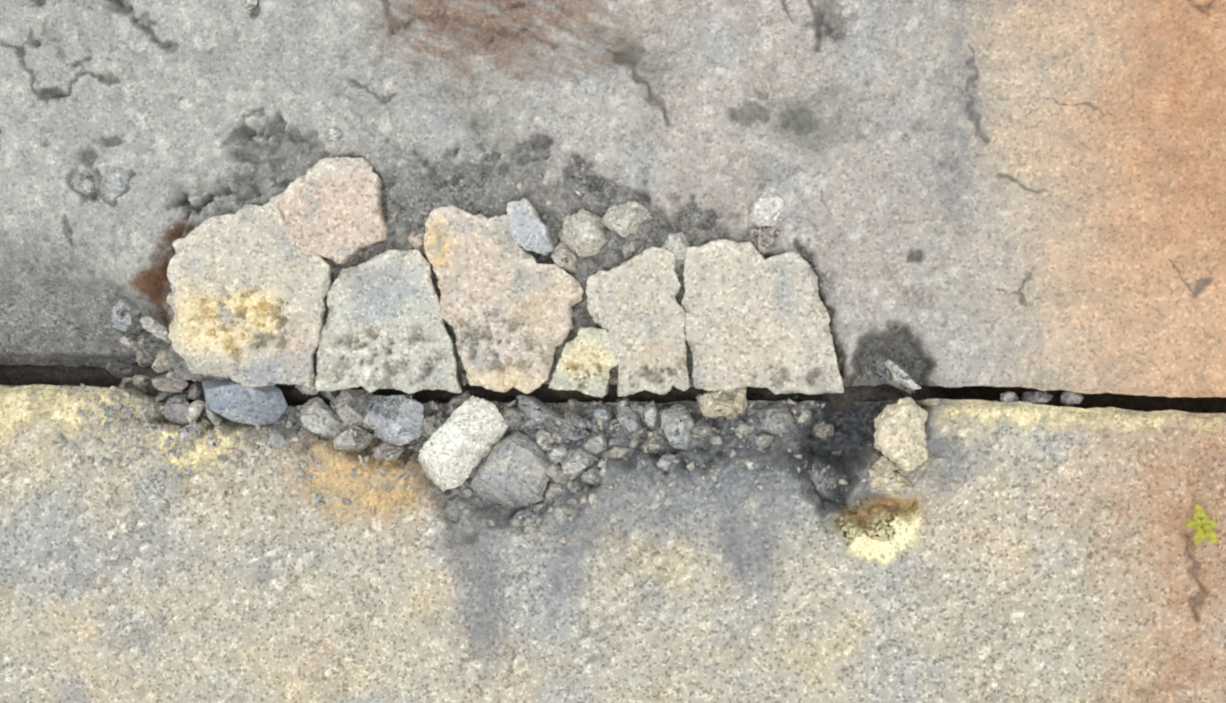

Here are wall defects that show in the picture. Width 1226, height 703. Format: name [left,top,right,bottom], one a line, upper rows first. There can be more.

spalling [442,457,490,519]
spalling [0,132,935,488]